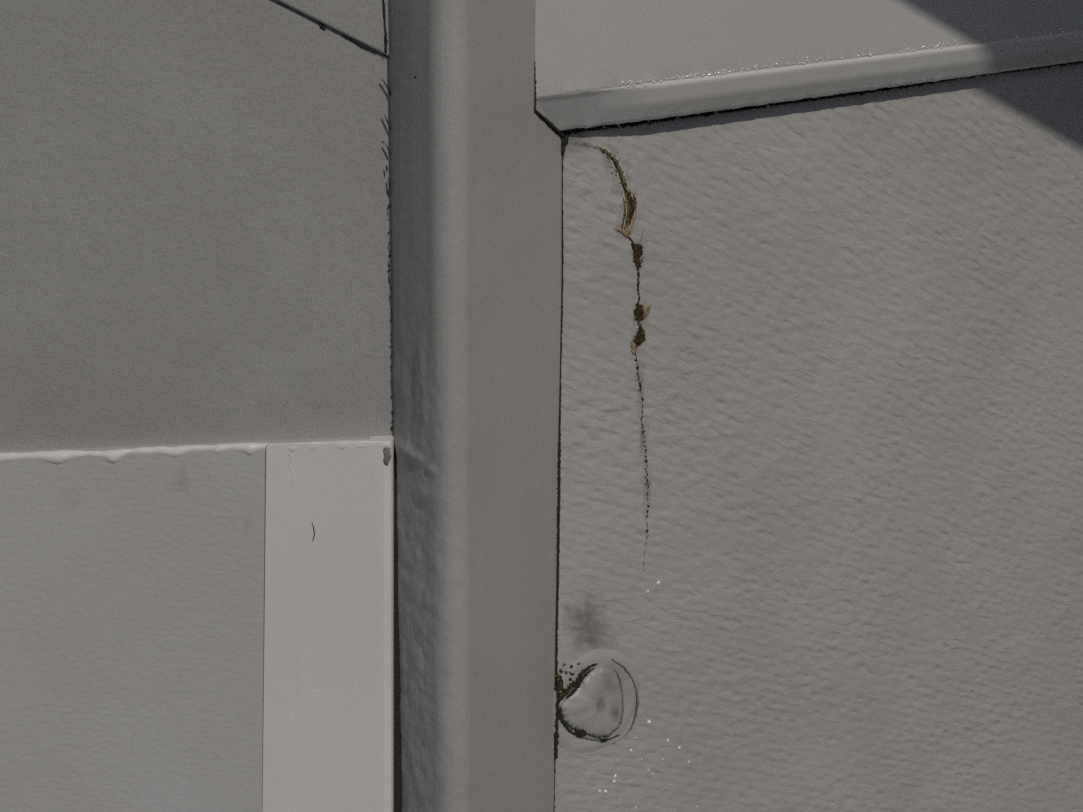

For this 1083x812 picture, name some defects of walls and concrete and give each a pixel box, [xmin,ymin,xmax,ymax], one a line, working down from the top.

crack [553,61,1083,812]